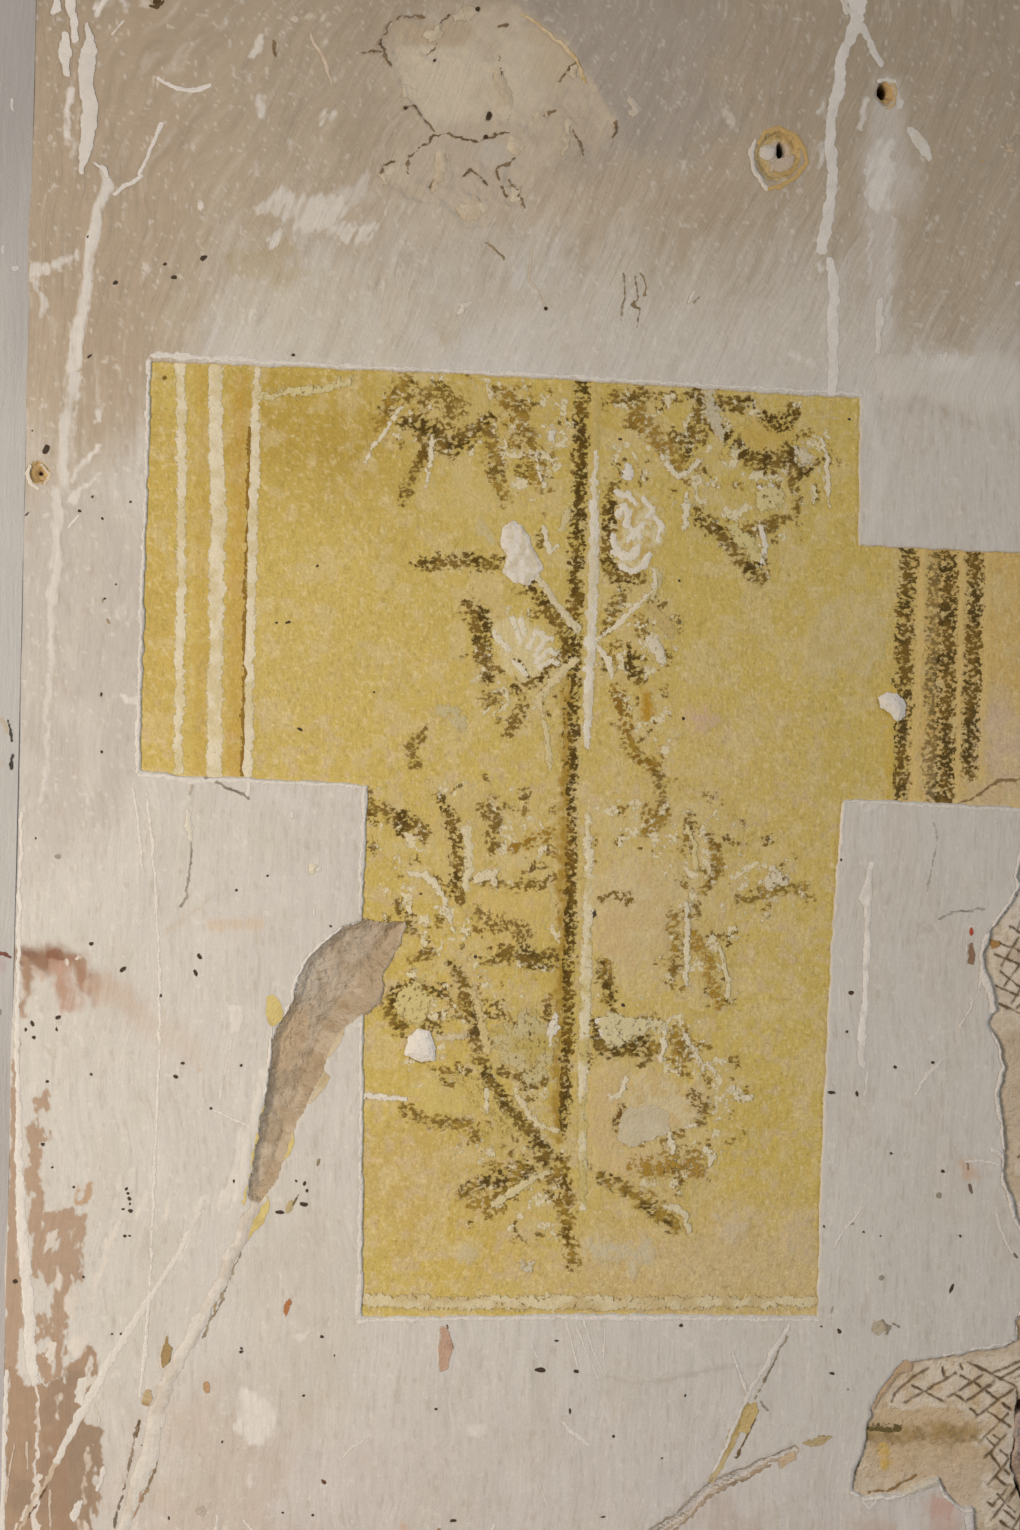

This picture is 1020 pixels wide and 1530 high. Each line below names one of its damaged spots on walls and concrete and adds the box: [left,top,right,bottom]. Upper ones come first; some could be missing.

spalling [251,0,628,252]
crack [783,0,884,397]
crack [7,0,164,804]
spalling [960,778,1019,803]
spalling [231,919,407,1240]
spalling [959,851,1020,1231]
crack [648,1323,832,1530]
spalling [850,1312,1020,1530]